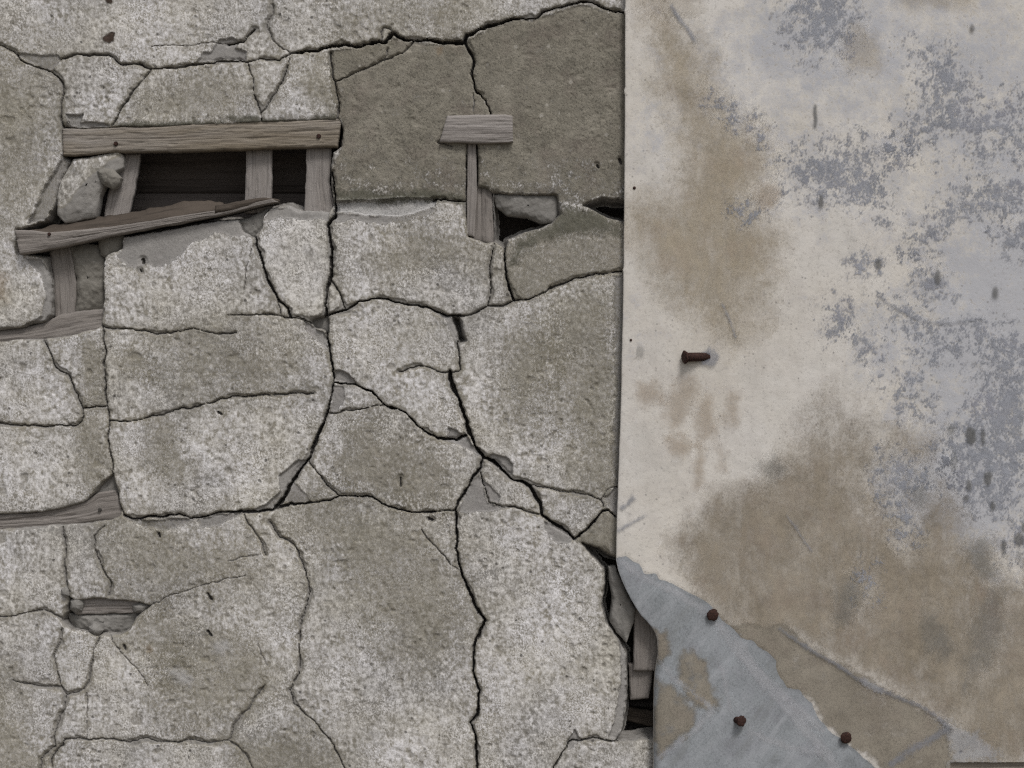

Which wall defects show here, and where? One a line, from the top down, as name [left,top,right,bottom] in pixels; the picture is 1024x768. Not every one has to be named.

hole [63,597,140,650]
crack [0,171,623,768]
crack [0,0,624,127]
flaking render [265,0,884,768]
water stain [635,23,775,338]
water stain [679,427,1024,768]
peeling [700,32,1024,564]